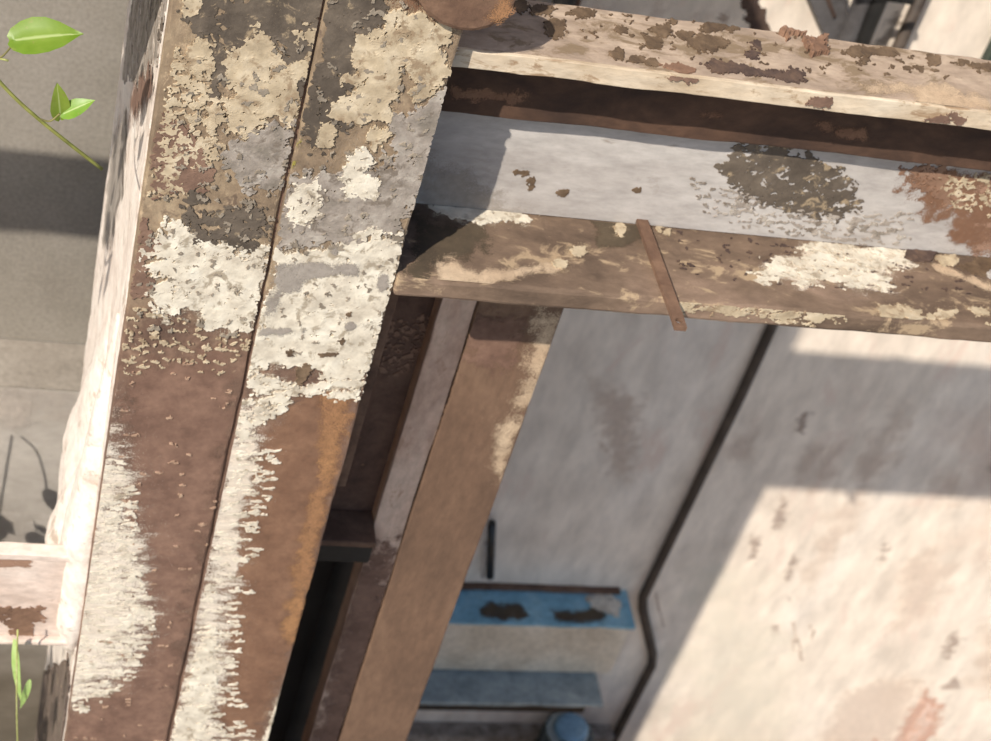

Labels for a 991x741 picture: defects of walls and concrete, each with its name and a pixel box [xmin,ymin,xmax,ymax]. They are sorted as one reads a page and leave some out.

corrosion [387,0,436,24]
corrosion [483,0,516,28]
peeling [513,0,991,85]
peeling [805,96,833,110]
peeling [551,242,591,272]
peeling [611,222,638,242]
peeling [679,143,991,328]
corrosion [892,162,991,277]
peeling [121,0,540,741]
peeling [35,442,191,741]
corrosion [65,341,358,741]
corrosion [310,527,402,741]